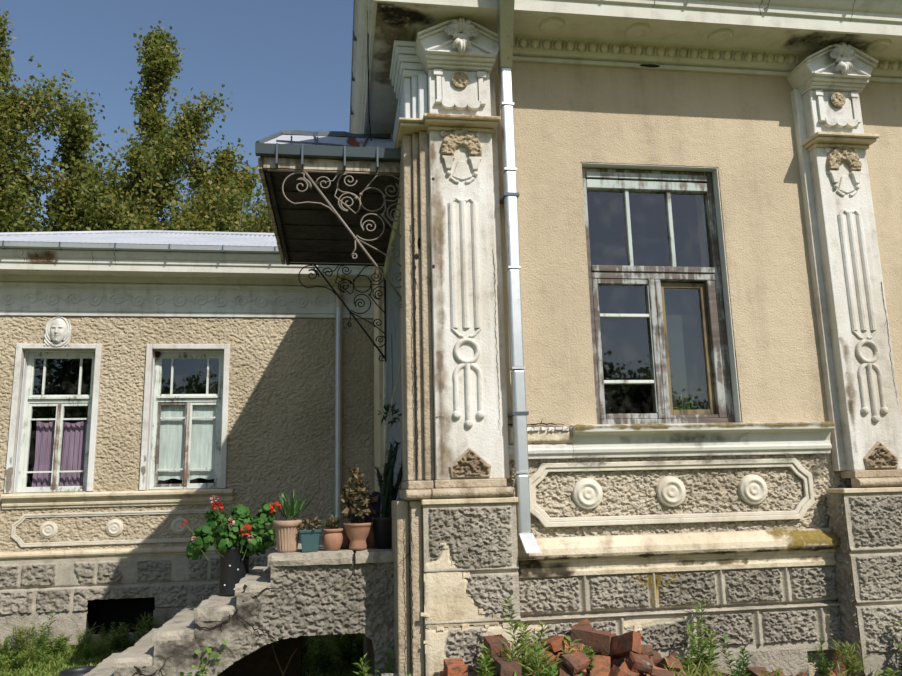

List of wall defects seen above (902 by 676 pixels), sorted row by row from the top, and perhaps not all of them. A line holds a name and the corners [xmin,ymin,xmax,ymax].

water stain [375,3,431,84]
water stain [786,32,863,49]
water stain [432,181,444,284]
water stain [437,351,445,392]
water stain [439,409,452,477]